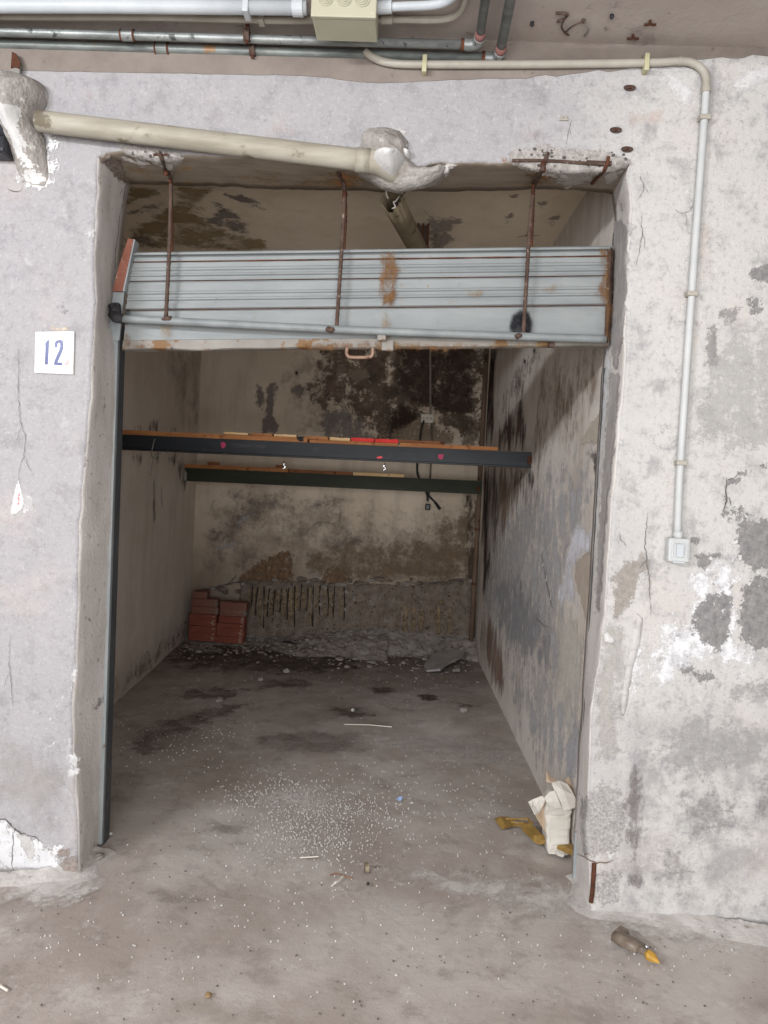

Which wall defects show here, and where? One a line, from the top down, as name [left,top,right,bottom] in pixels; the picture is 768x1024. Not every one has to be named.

damp [127,187,266,251]
spalling [509,143,632,333]
damp [256,383,280,433]
damp [291,349,592,791]
crack [620,514,651,608]
damp [595,553,755,759]